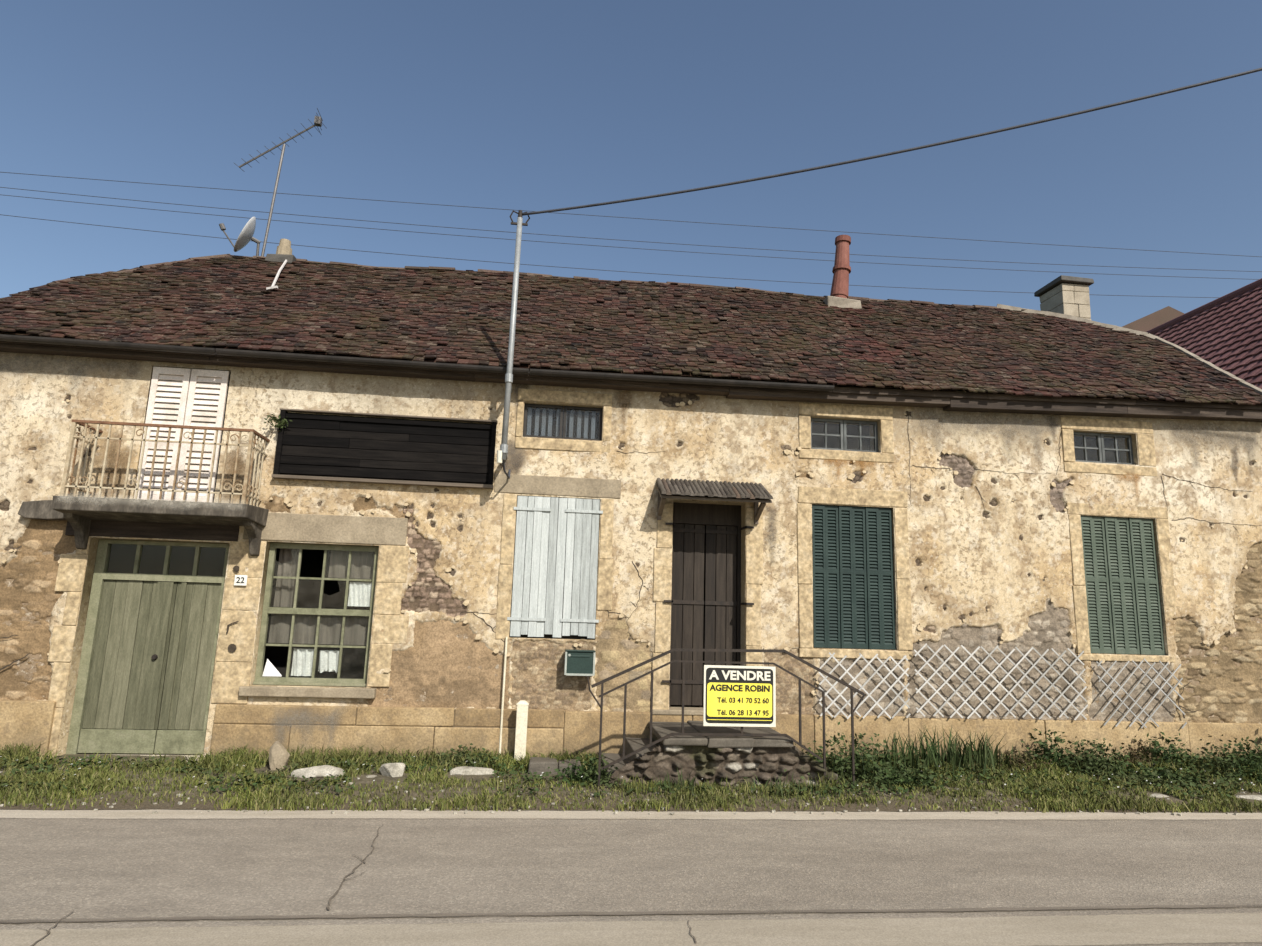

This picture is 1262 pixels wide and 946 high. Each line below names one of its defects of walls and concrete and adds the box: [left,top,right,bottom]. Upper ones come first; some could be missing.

flaking render [923,449,975,501]
flaking render [1037,477,1075,520]
crack [1161,474,1261,533]
spalling [2,540,22,564]
peeling [353,488,513,709]
flaking render [917,622,936,641]